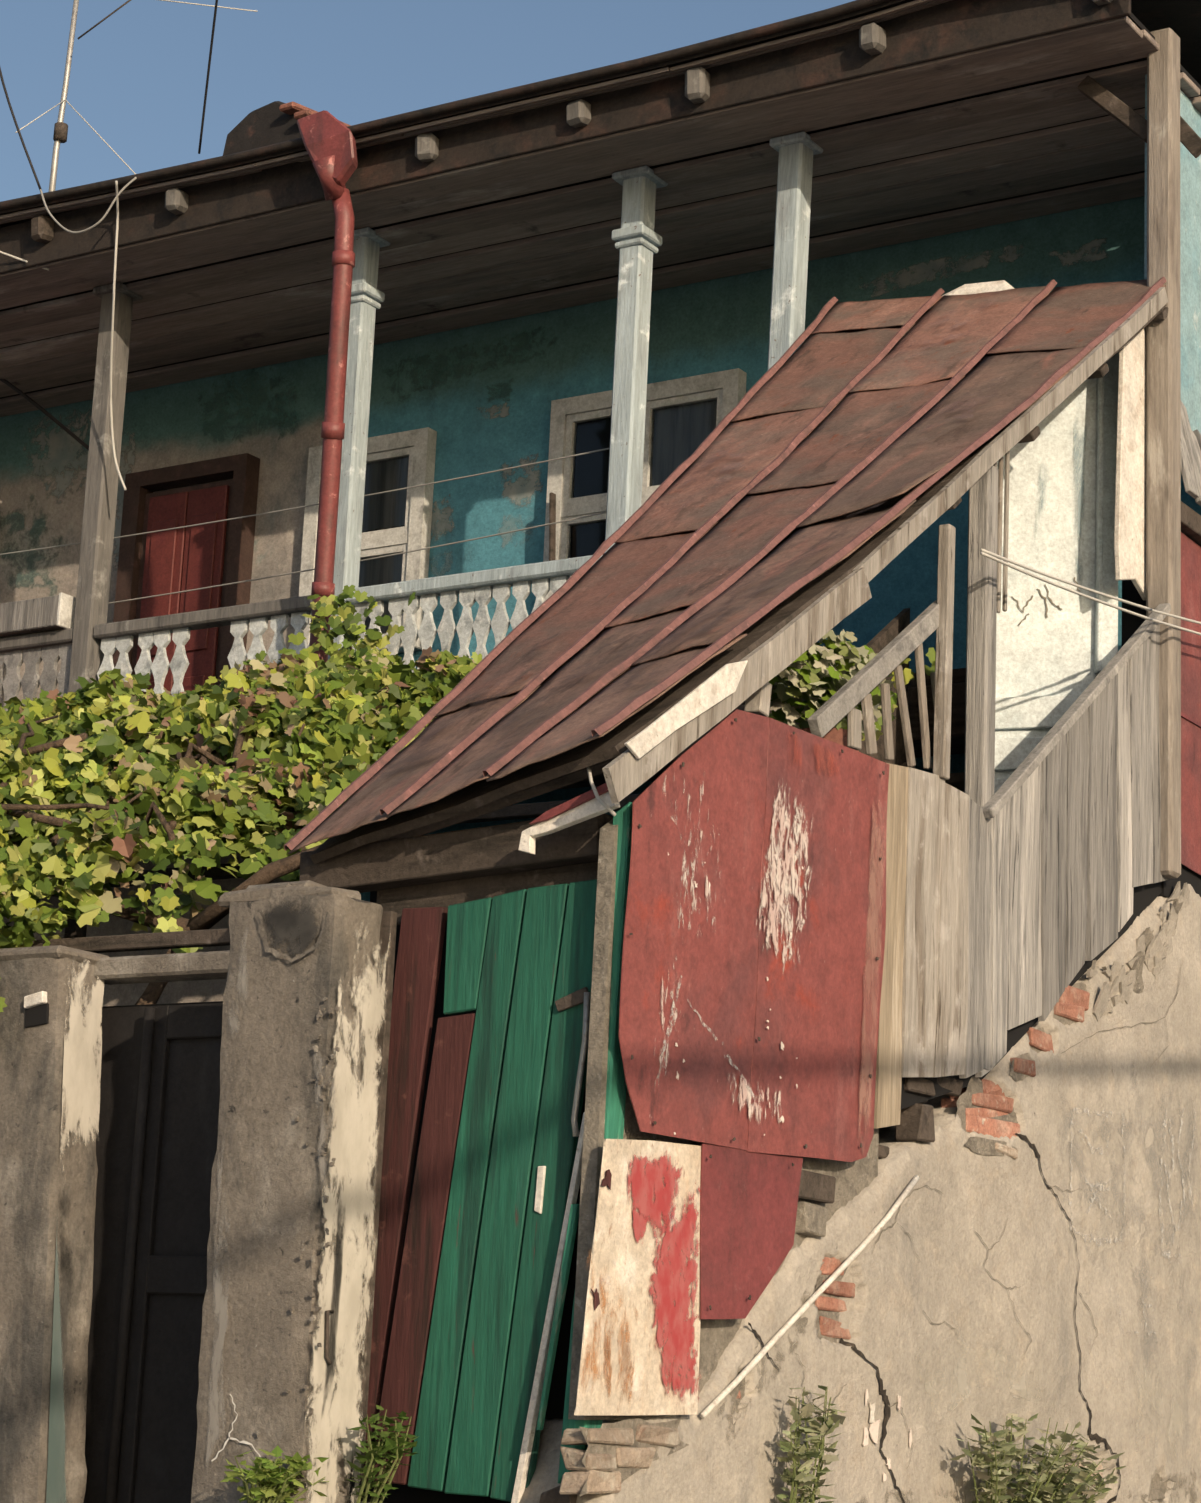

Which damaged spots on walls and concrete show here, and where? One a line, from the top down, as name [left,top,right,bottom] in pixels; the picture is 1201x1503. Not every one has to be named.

peeling [862,245,1022,301]
peeling [756,791,812,966]
peeling [60,961,104,1154]
spalling [941,881,1190,1159]
peeling [206,1167,229,1465]
peeling [284,933,389,1503]
crack [748,1322,913,1503]
spalling [813,1257,855,1343]
crack [1016,1133,1121,1503]